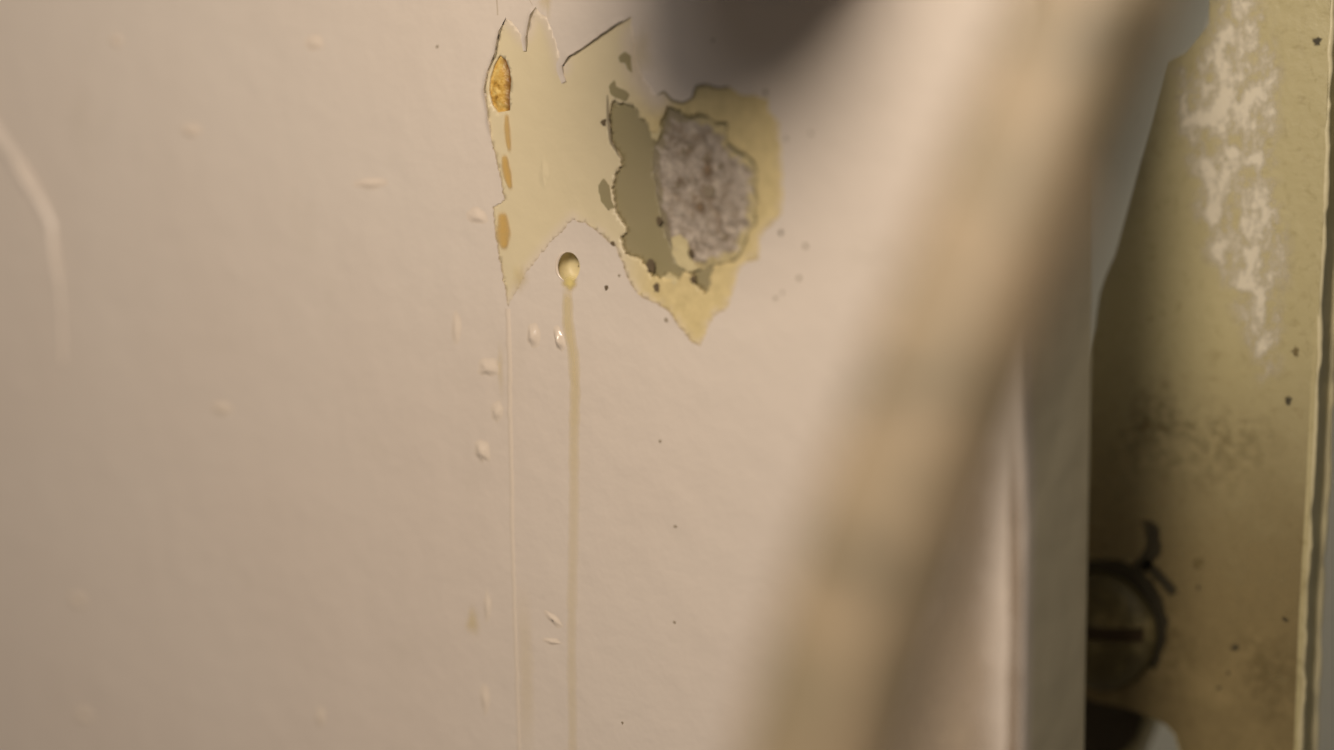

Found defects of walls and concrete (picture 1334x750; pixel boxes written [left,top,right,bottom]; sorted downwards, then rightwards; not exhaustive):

rust [490,56,511,187]
rust [498,214,508,247]
peeling [479,5,784,346]